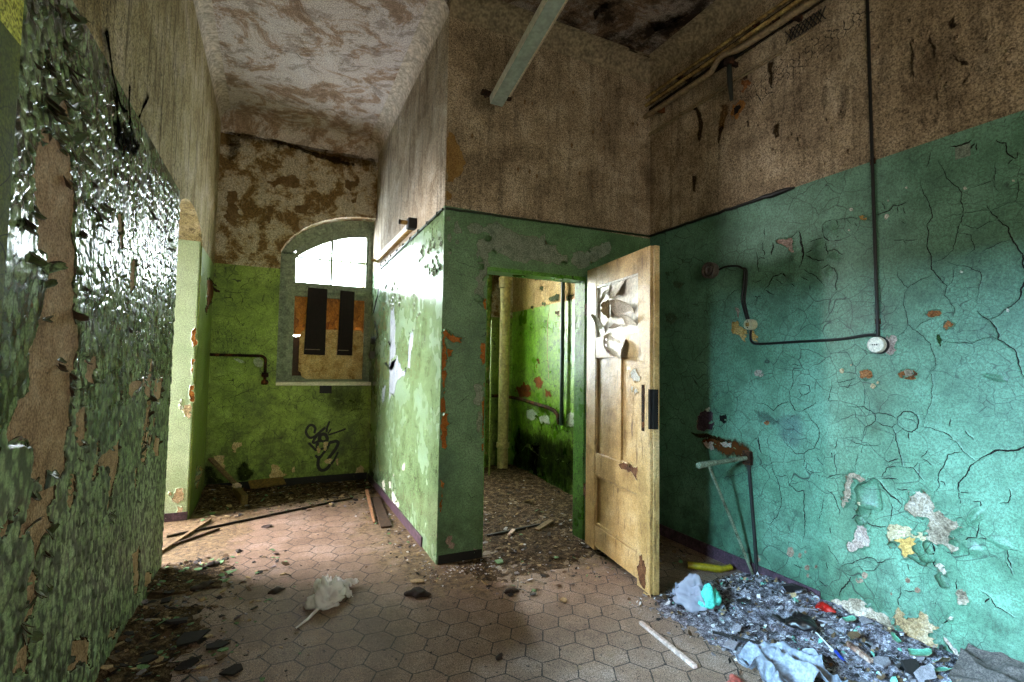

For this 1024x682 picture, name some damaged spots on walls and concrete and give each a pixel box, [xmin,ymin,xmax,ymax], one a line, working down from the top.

water stain [226,132,376,167]
peeling [121,257,159,291]
peeling [149,208,175,251]
peeling [417,216,611,316]
peeling [0,3,125,678]
spalling [178,327,198,419]
peeling [381,282,421,404]
peeling [439,327,463,450]
peeling [514,358,552,425]
crack [725,119,1024,653]
spalling [381,462,406,509]
peeling [826,470,972,656]